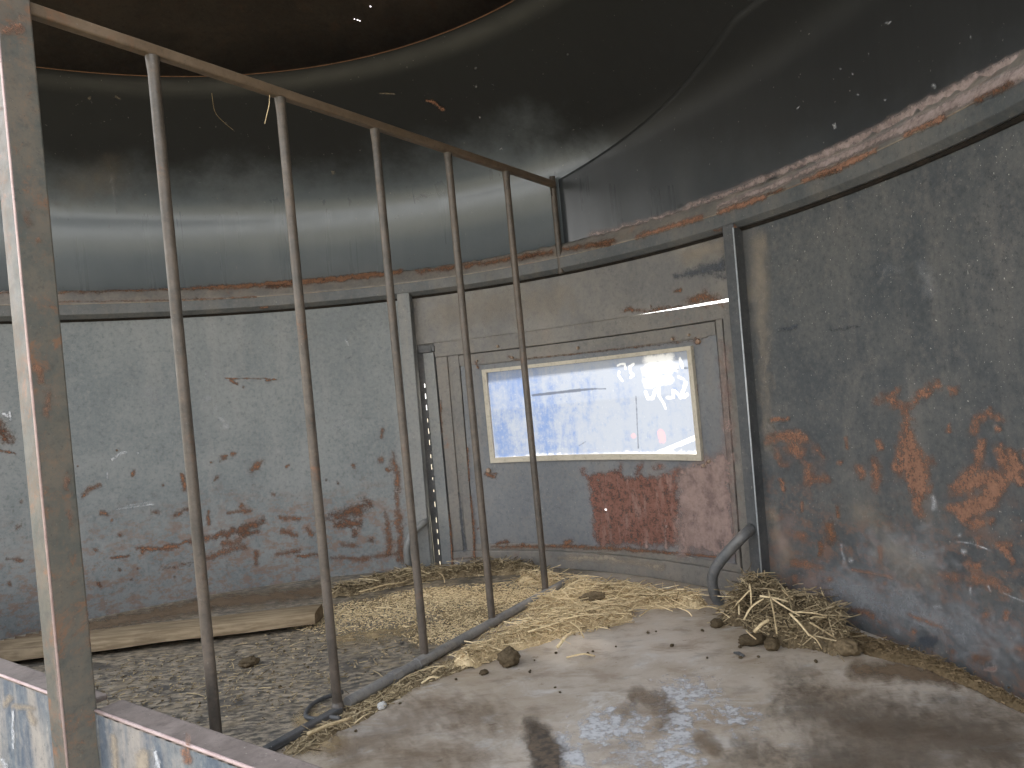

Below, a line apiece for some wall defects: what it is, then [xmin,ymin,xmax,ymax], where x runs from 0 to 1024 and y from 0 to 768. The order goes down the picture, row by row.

corrosion [973,80,1014,103]
corrosion [58,239,616,309]
corrosion [111,503,265,571]
corrosion [325,453,404,563]
corrosion [493,409,735,558]
corrosion [764,417,829,492]
corrosion [855,379,957,519]
corrosion [945,407,1024,565]